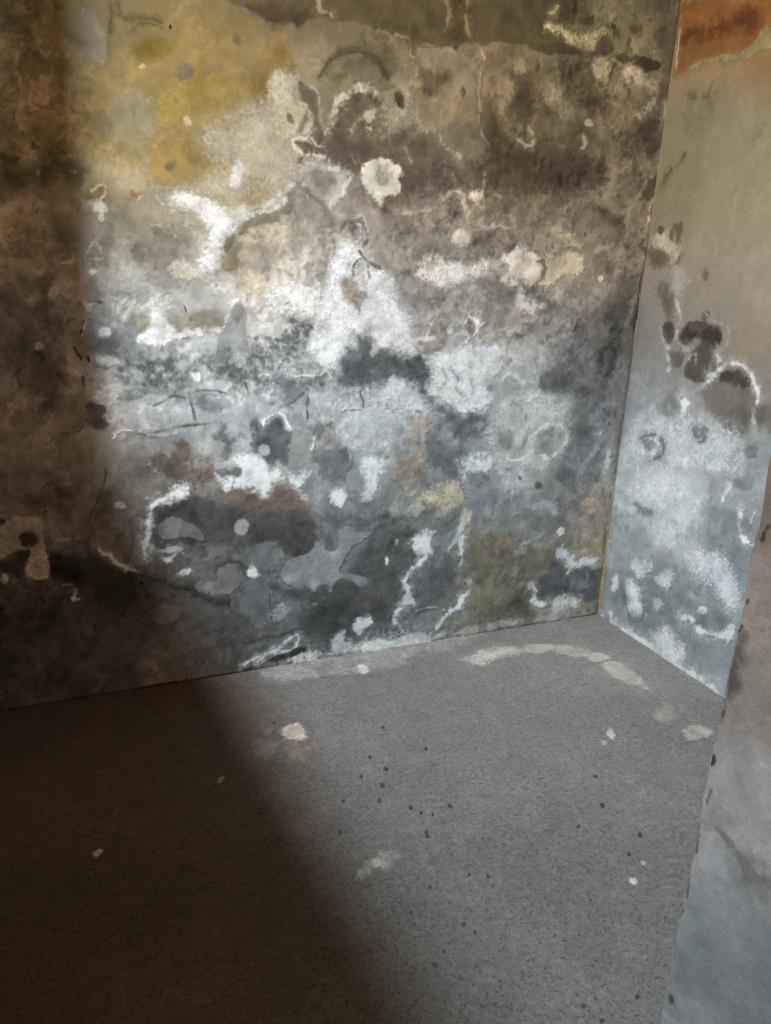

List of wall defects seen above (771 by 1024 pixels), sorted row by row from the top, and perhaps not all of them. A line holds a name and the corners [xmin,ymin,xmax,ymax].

rust [674,0,771,78]
damp [45,46,756,696]
crack [112,382,247,440]
crack [279,391,309,420]
damp [737,505,770,546]
damp [0,552,32,576]
damp [683,725,712,740]